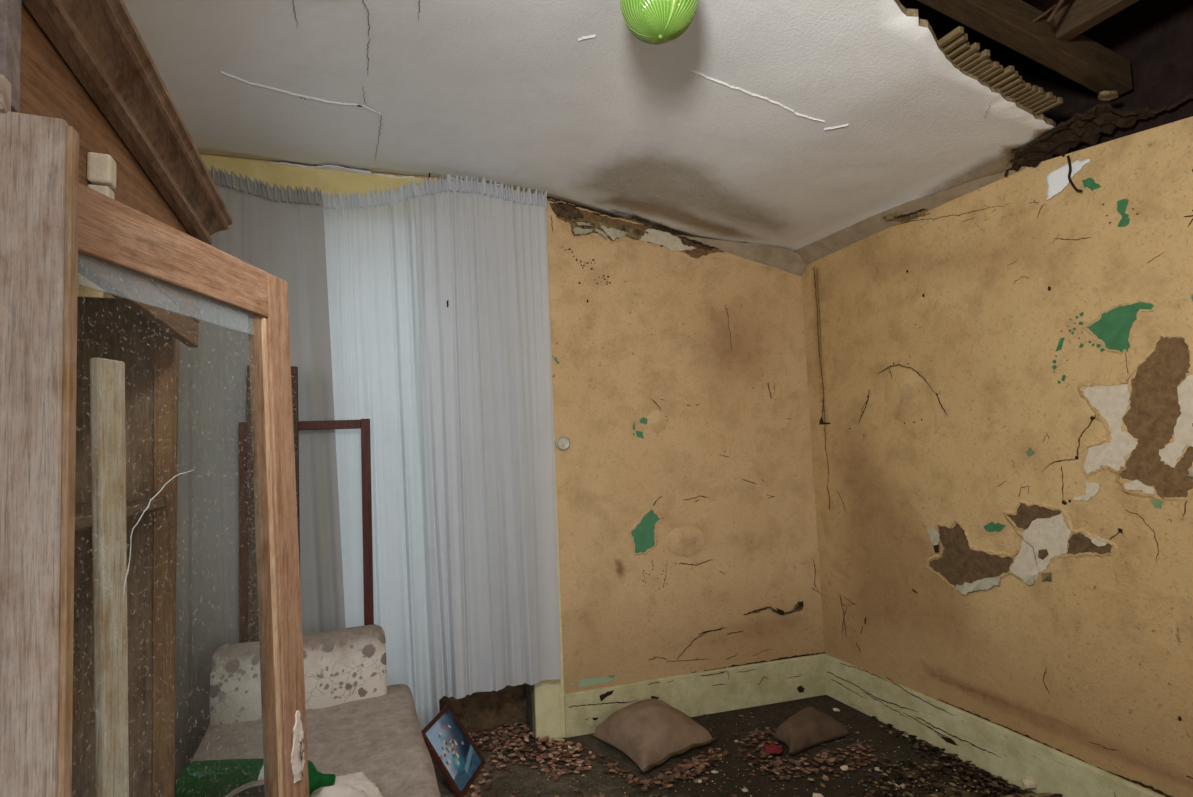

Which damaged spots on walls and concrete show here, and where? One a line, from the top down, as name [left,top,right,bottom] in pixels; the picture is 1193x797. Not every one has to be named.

crack [362,0,382,160]
peeling [1046,159,1101,201]
spalling [547,196,729,261]
leakage [548,199,739,237]
peeling [1102,199,1138,227]
spalling [926,298,1193,595]
peeling [628,506,662,556]
crack [569,560,1001,758]